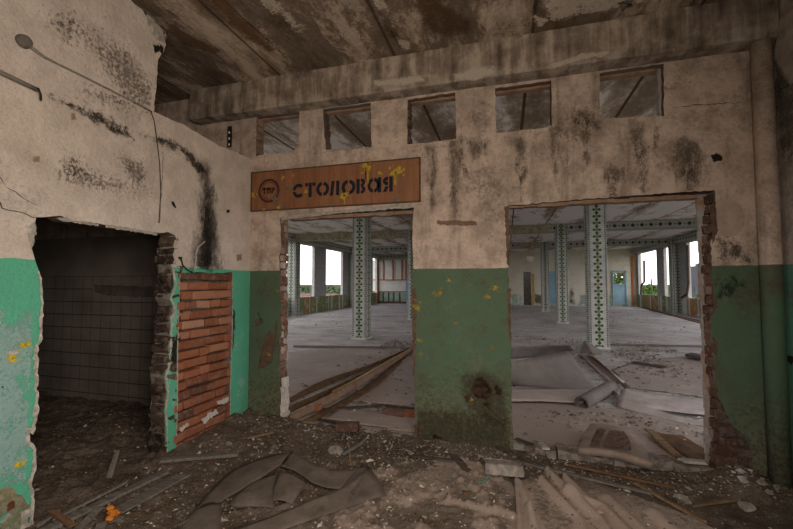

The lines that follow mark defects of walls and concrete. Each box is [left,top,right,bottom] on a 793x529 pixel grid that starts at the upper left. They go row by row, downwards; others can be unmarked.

water stain [45,13,151,113]
crack [0,177,36,218]
water stain [53,155,152,194]
peeling [0,271,44,529]